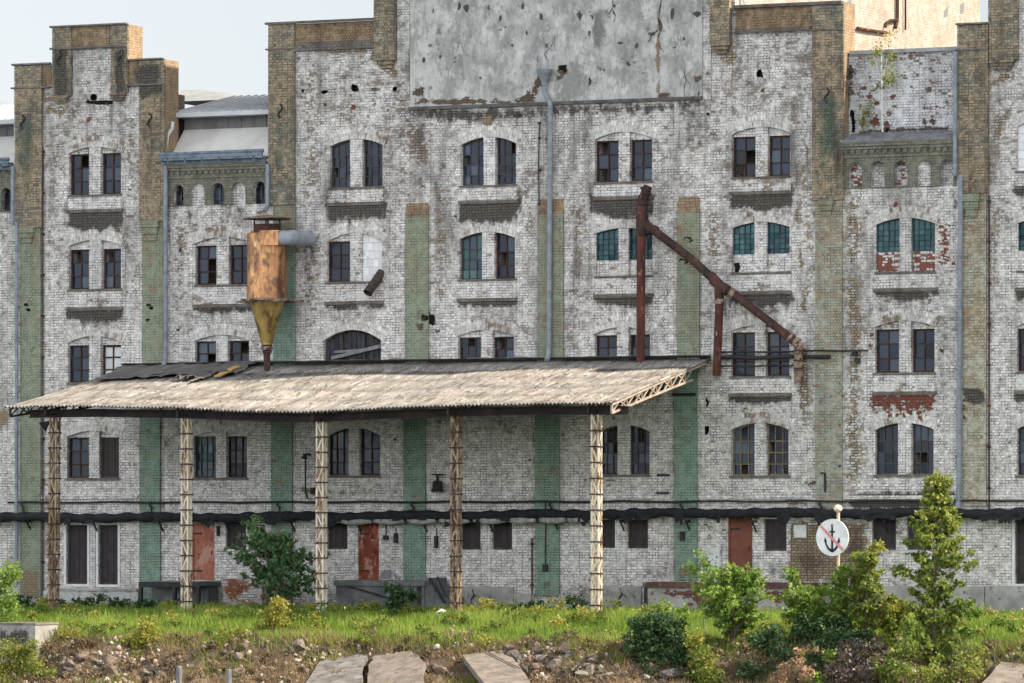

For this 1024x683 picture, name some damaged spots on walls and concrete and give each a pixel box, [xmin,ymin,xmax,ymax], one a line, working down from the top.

crack [648,0,664,54]
spalling [403,77,542,163]
spalling [849,65,896,132]
peeling [843,192,937,492]
spalling [662,588,711,608]